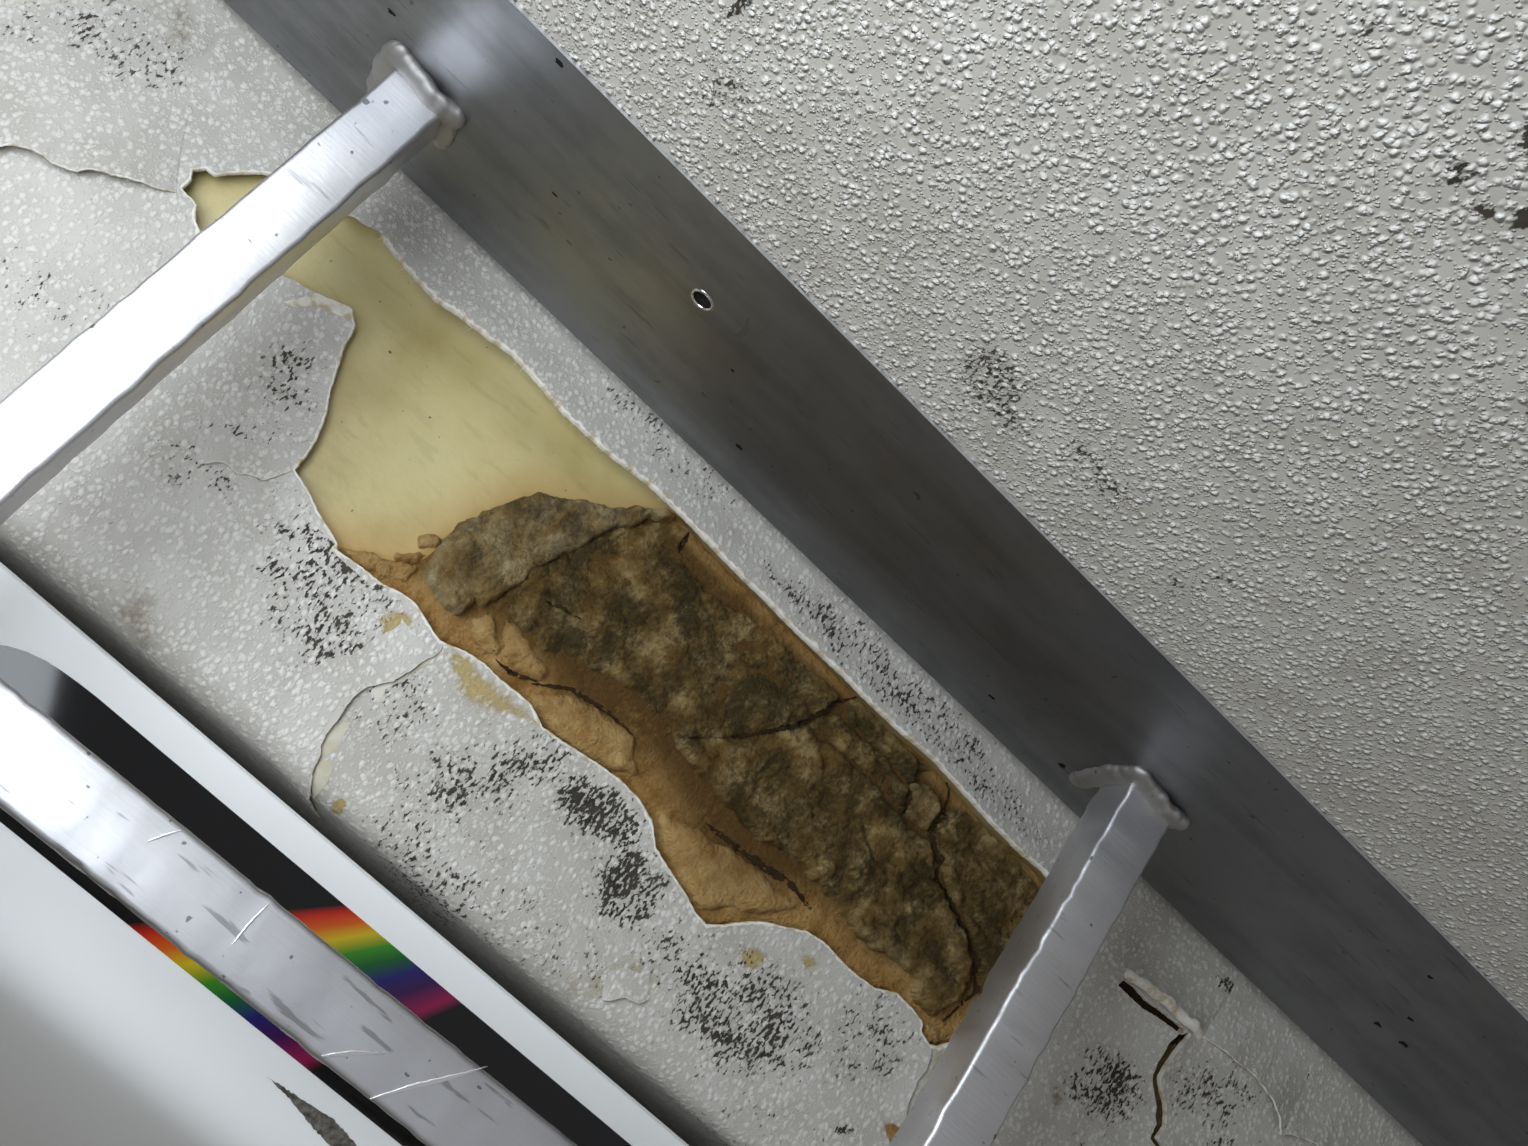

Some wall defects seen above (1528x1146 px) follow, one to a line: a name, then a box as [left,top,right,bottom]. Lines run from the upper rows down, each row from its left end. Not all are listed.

leakage [252,490,411,667]
leakage [355,671,440,750]
leakage [453,656,520,714]
flaking render [343,492,1038,1045]
leakage [764,560,1041,840]
leakage [362,730,914,1136]
leakage [1055,1046,1146,1126]
crack [1118,942,1220,1146]
leakage [1169,1059,1261,1146]